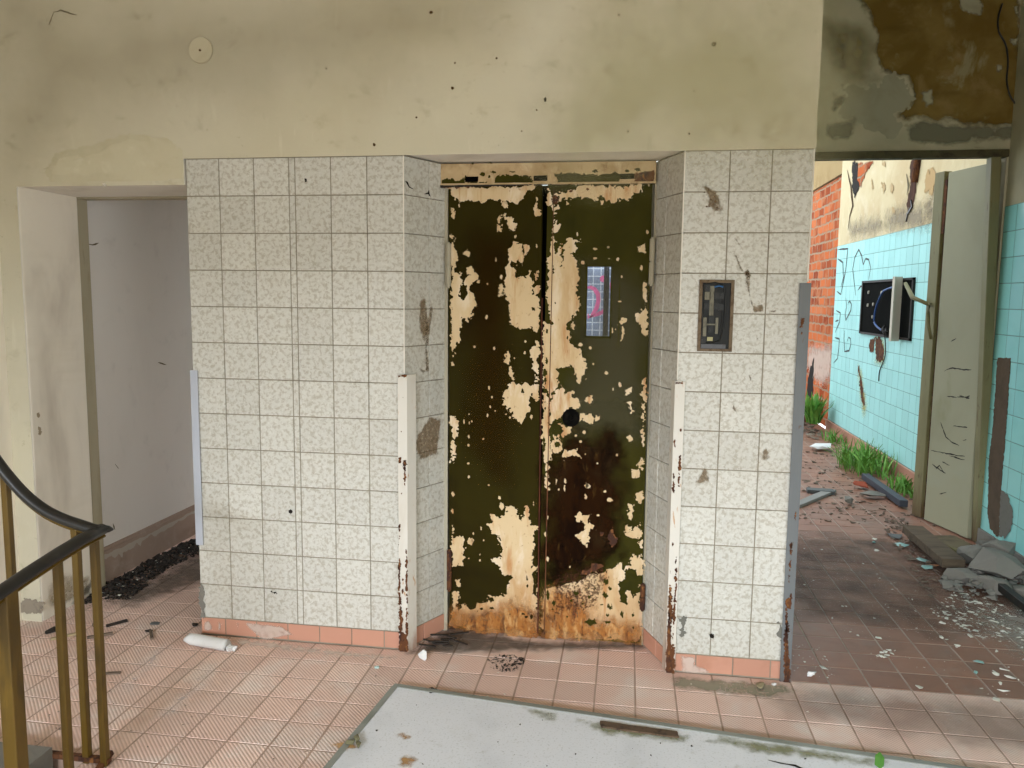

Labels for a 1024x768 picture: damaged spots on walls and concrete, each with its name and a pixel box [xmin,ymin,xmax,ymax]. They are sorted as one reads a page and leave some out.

flaking render [852,161,894,198]
peeling [892,160,936,215]
peeling [448,183,649,491]
rust [416,418,440,458]
rust [452,298,642,643]
peeling [987,358,1013,539]
rust [398,524,409,652]
peeling [449,491,646,643]
rust [665,559,678,674]
rust [783,542,793,683]